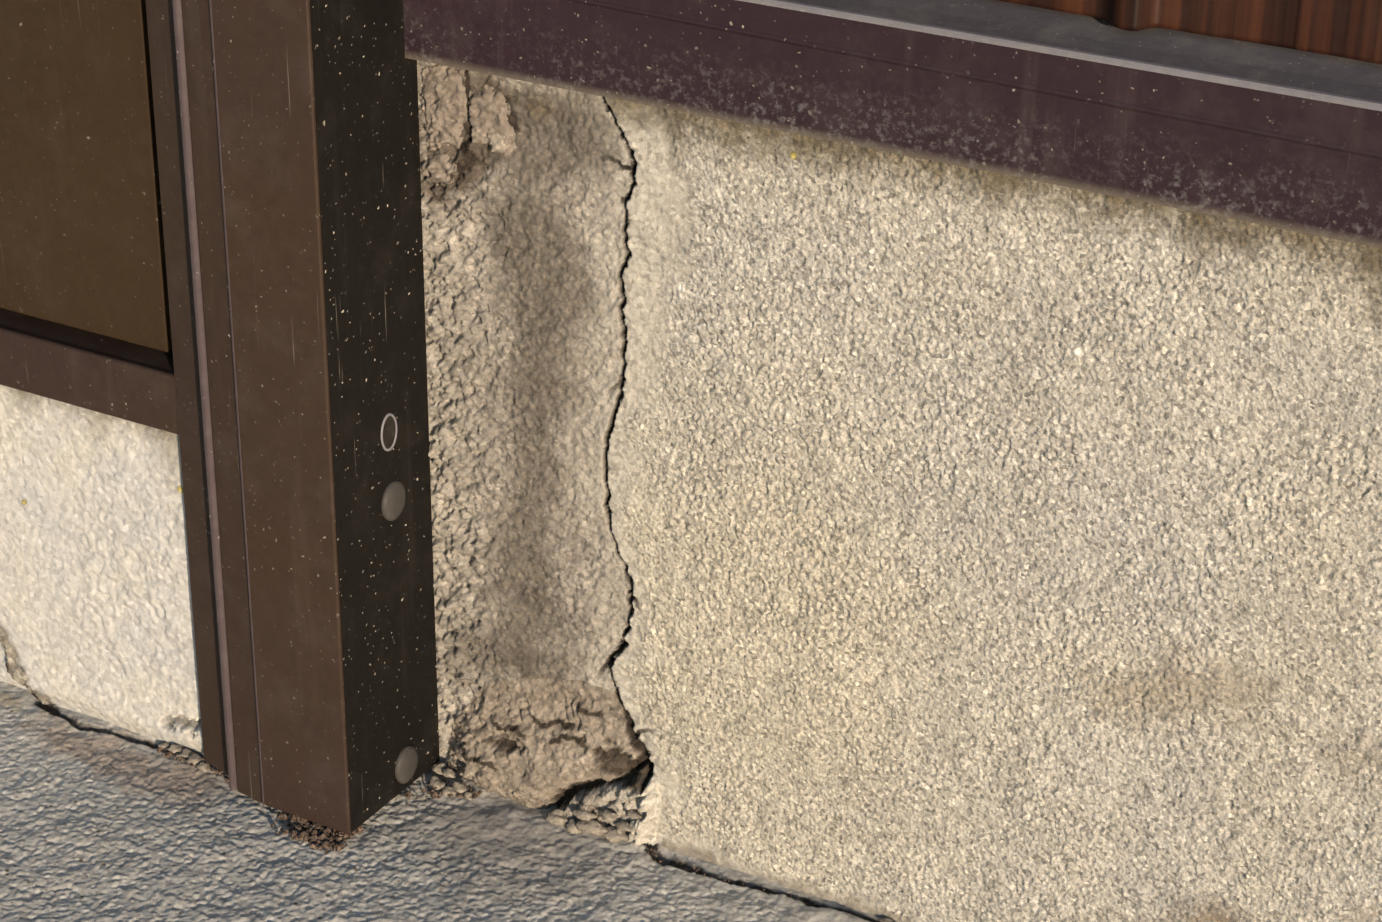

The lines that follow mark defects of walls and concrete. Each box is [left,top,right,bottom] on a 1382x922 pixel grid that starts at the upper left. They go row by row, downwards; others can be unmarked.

peeling [420,64,519,202]
leakage [498,197,581,674]
crack [543,100,895,922]
crack [37,702,179,753]
crack [427,761,473,800]